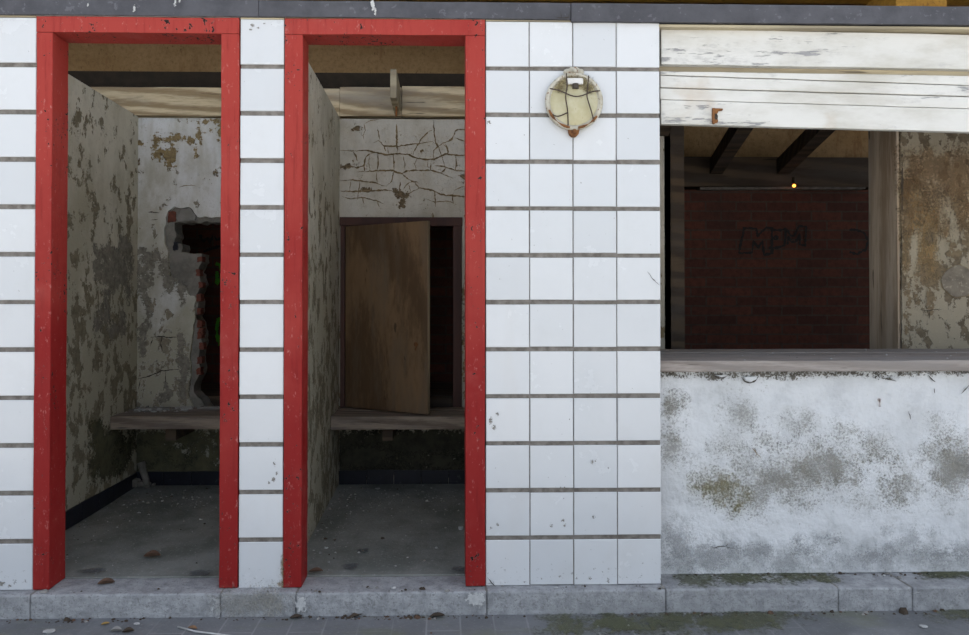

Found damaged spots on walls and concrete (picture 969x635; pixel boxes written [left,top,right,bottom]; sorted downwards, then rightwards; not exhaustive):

peeling [138,118,221,174]
crack [341,119,465,206]
peeling [901,185,969,341]
water stain [686,466,750,512]